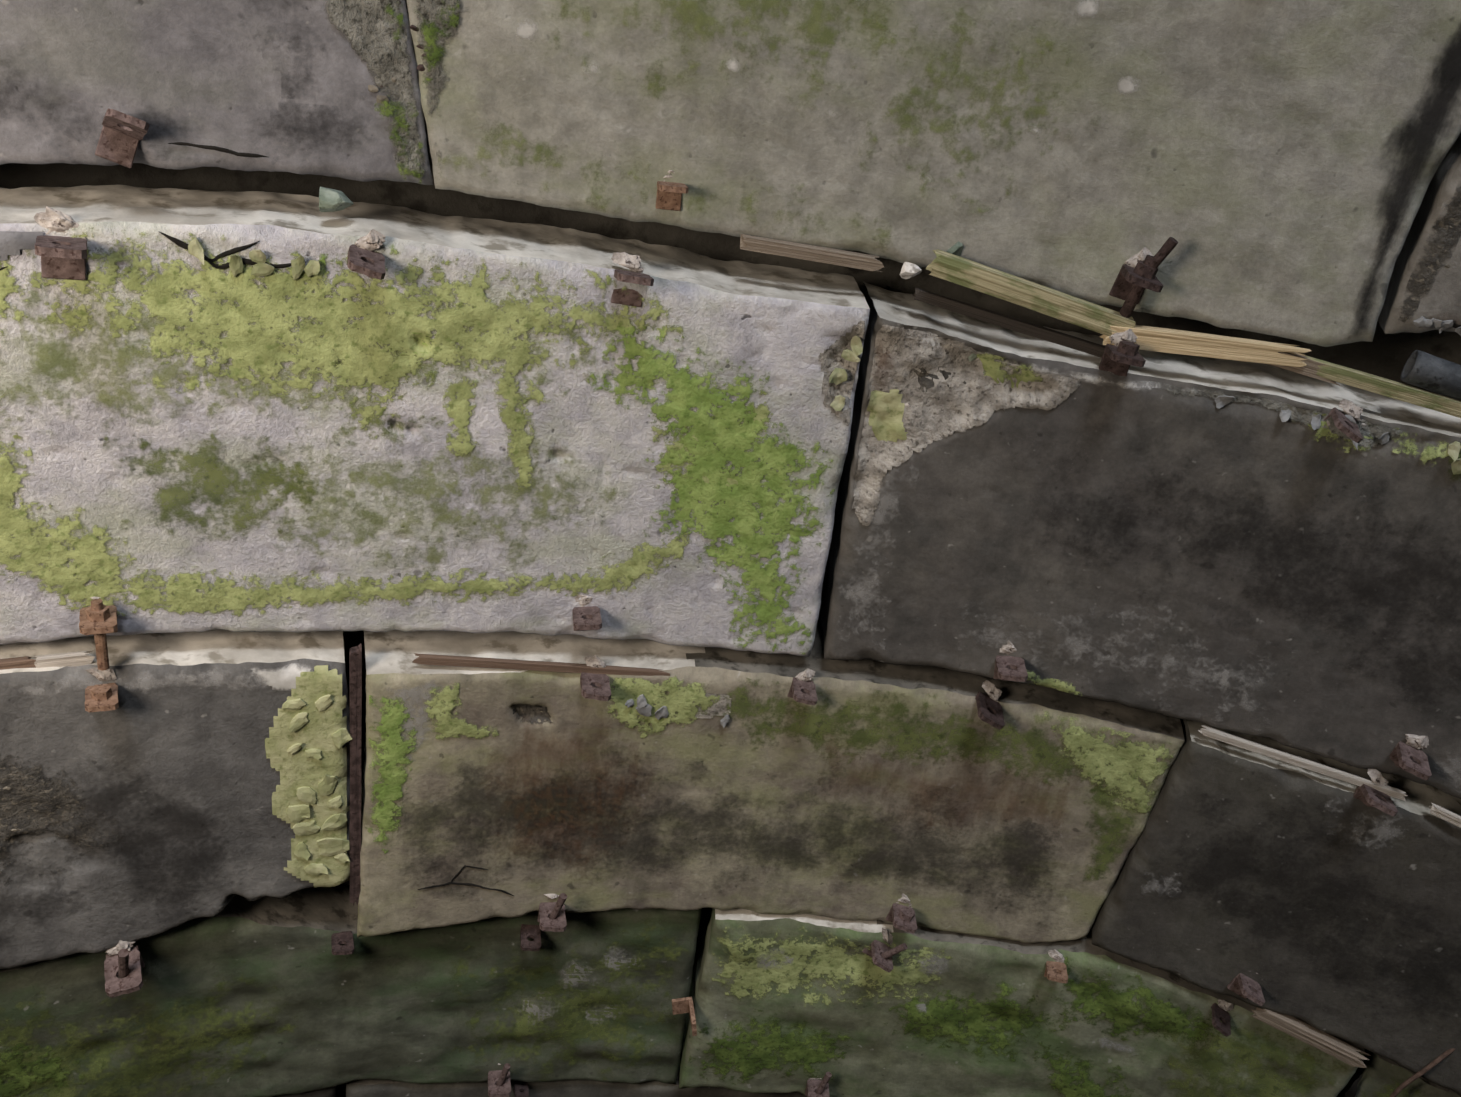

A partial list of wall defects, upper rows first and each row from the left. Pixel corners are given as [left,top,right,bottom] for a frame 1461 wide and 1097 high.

spalling [326,0,462,183]
water stain [1355,29,1461,334]
spalling [819,321,1081,526]
water stain [422,773,812,865]